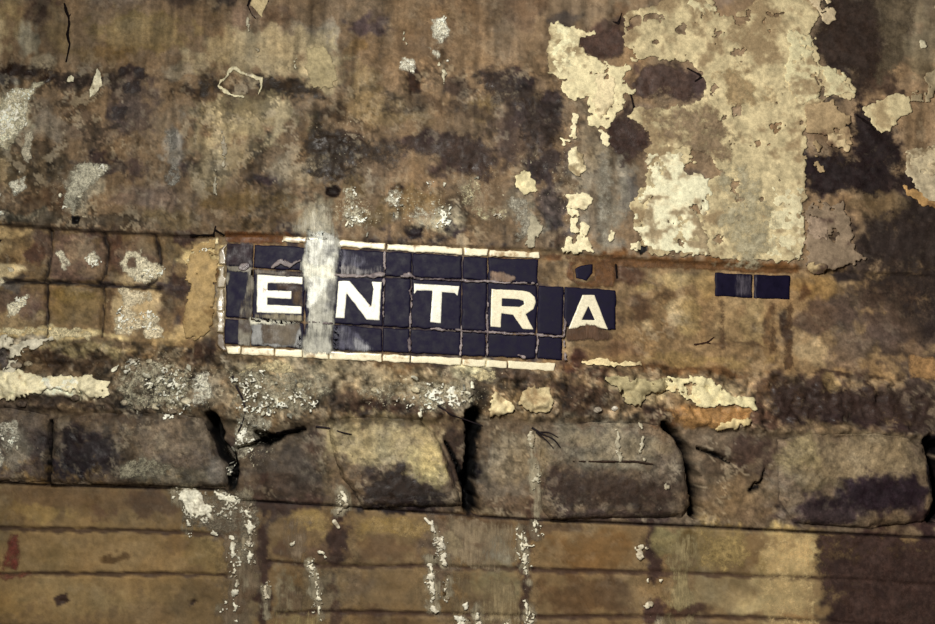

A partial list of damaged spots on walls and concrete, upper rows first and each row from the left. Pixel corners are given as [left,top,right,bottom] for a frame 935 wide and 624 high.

crack [63,3,71,62]
peeling [546,0,867,274]
peeling [862,69,935,133]
peeling [903,145,935,208]
peeling [0,334,110,401]
leakage [226,360,331,476]
crack [253,428,306,443]
peeling [581,358,758,431]
leakage [178,488,348,624]
leakage [359,514,544,624]
leakage [635,544,649,560]
leakage [761,532,935,624]